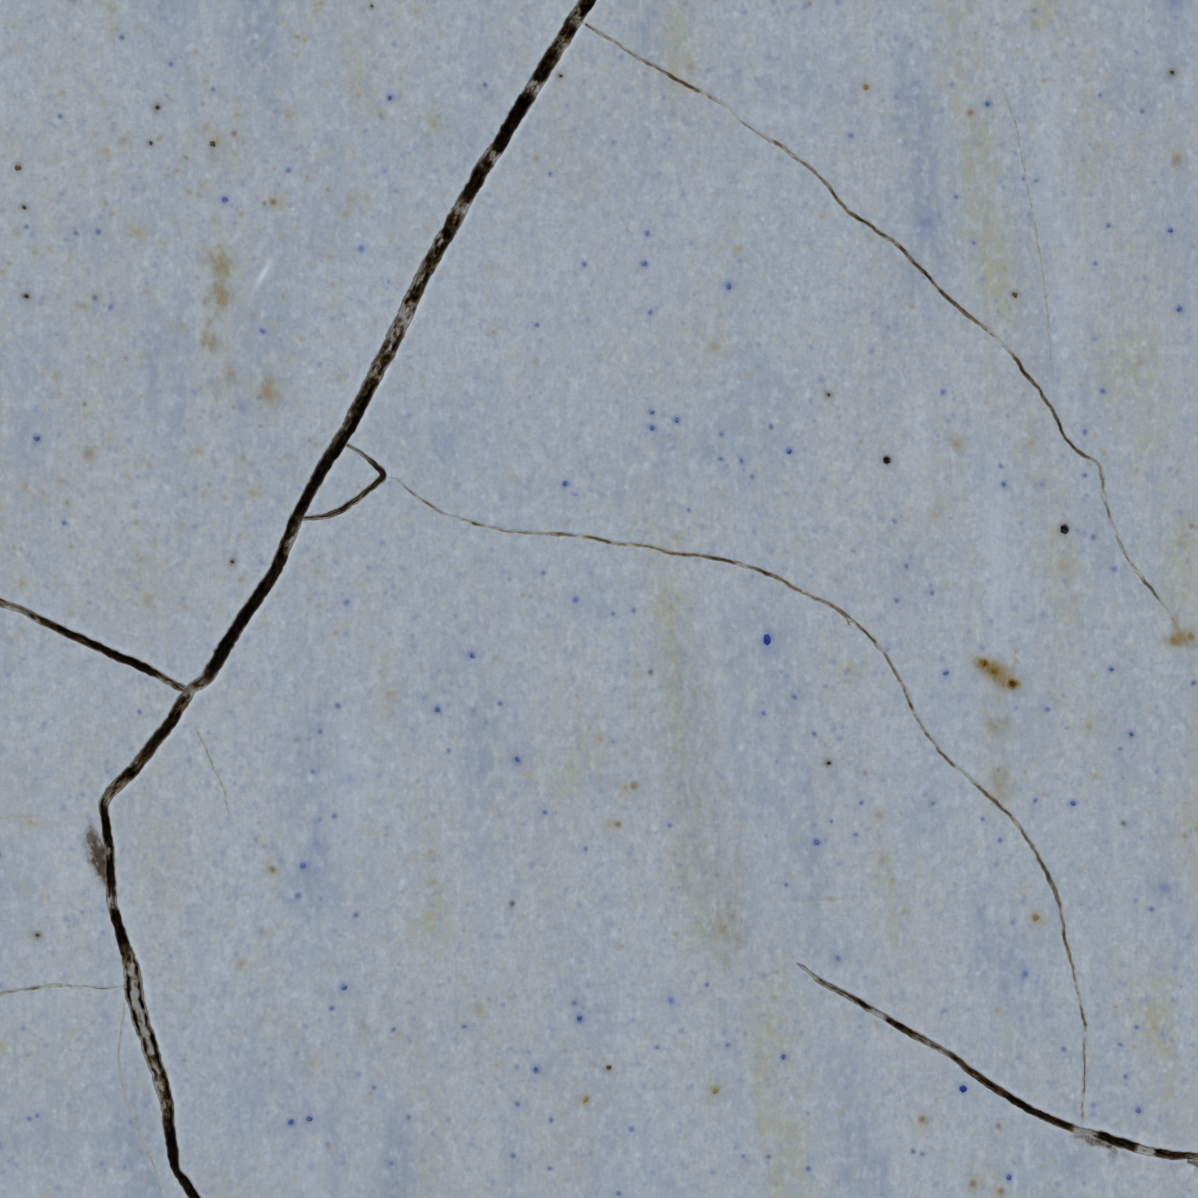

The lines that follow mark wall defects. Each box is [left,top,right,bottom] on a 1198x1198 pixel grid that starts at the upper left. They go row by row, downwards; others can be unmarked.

crack [0,0,596,1198]
crack [385,476,1198,1168]
crack [582,22,1175,624]
rust [978,659,1020,689]